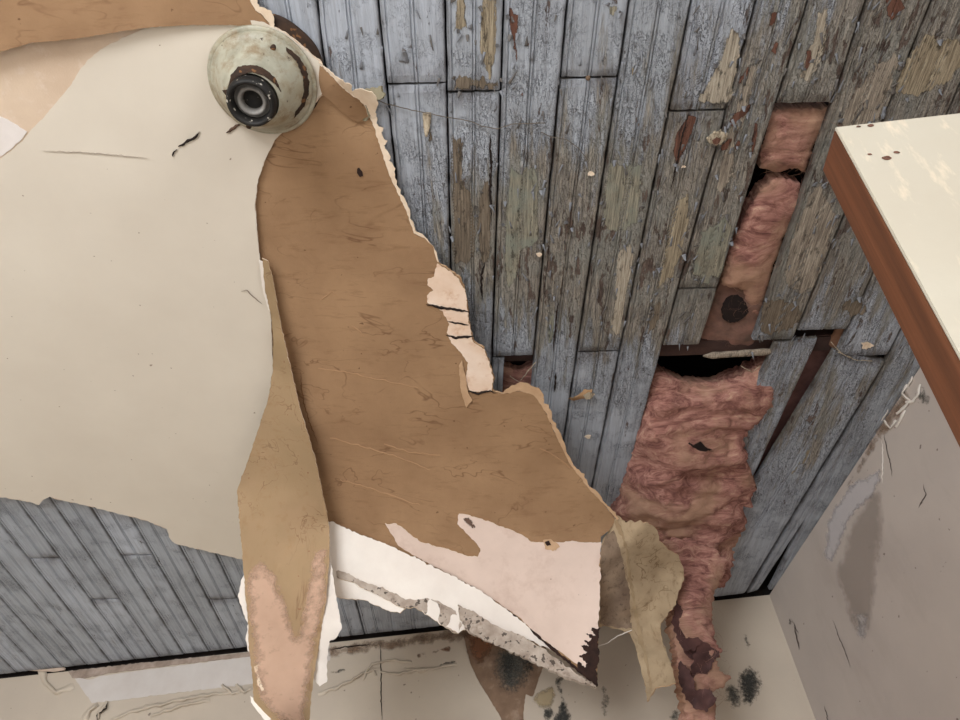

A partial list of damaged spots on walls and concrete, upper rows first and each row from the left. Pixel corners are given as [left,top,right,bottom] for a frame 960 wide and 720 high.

peeling [867,0,905,39]
corrosion [222,65,281,95]
corrosion [286,47,310,118]
peeling [829,31,960,127]
crack [54,150,143,158]
crack [172,132,199,156]
peeling [423,112,433,142]
peeling [486,0,854,352]
spalling [427,135,505,407]
peeling [840,262,876,338]
peeling [336,570,597,720]
mould [728,671,758,702]